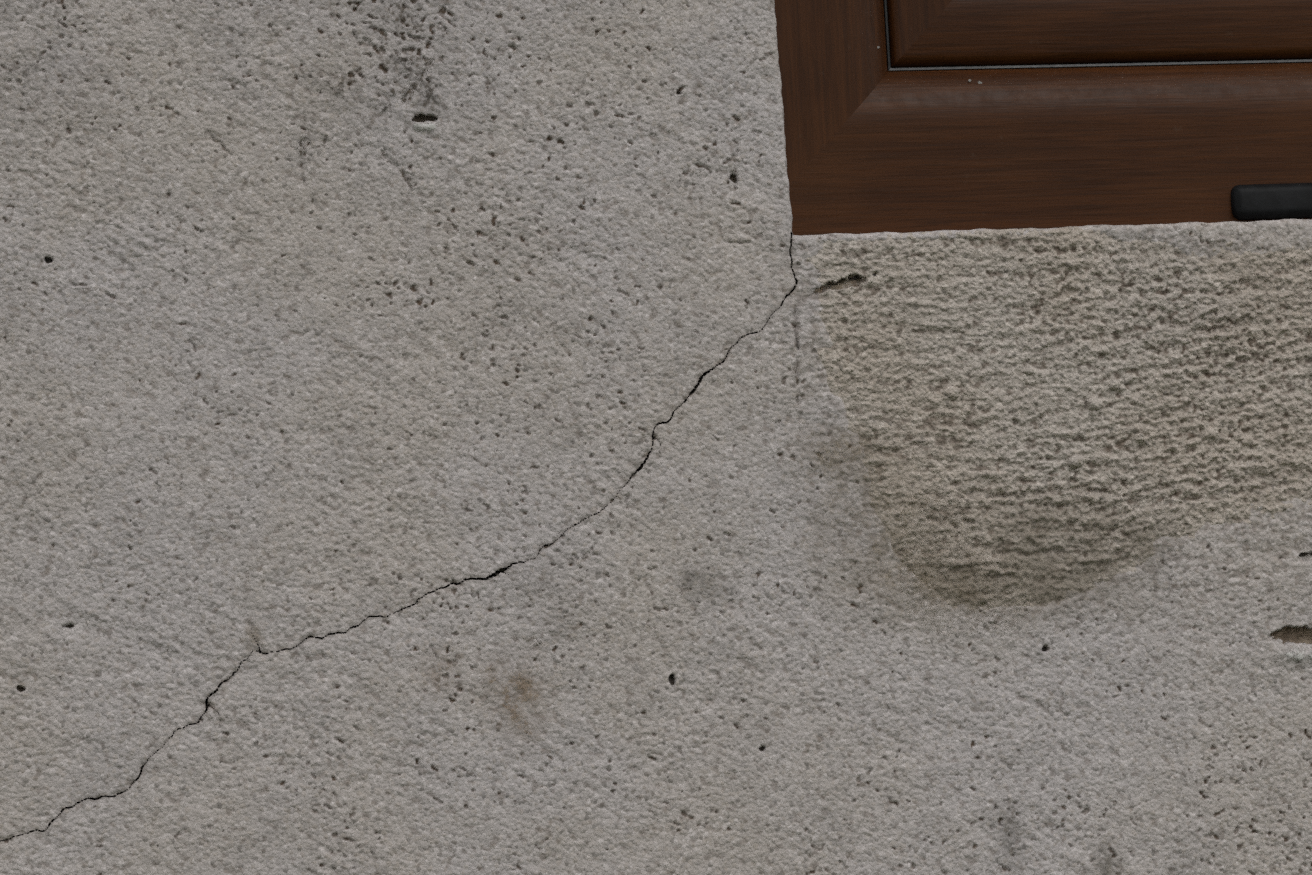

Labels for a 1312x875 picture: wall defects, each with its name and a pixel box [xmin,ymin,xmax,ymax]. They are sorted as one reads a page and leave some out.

crack [0,234,799,842]